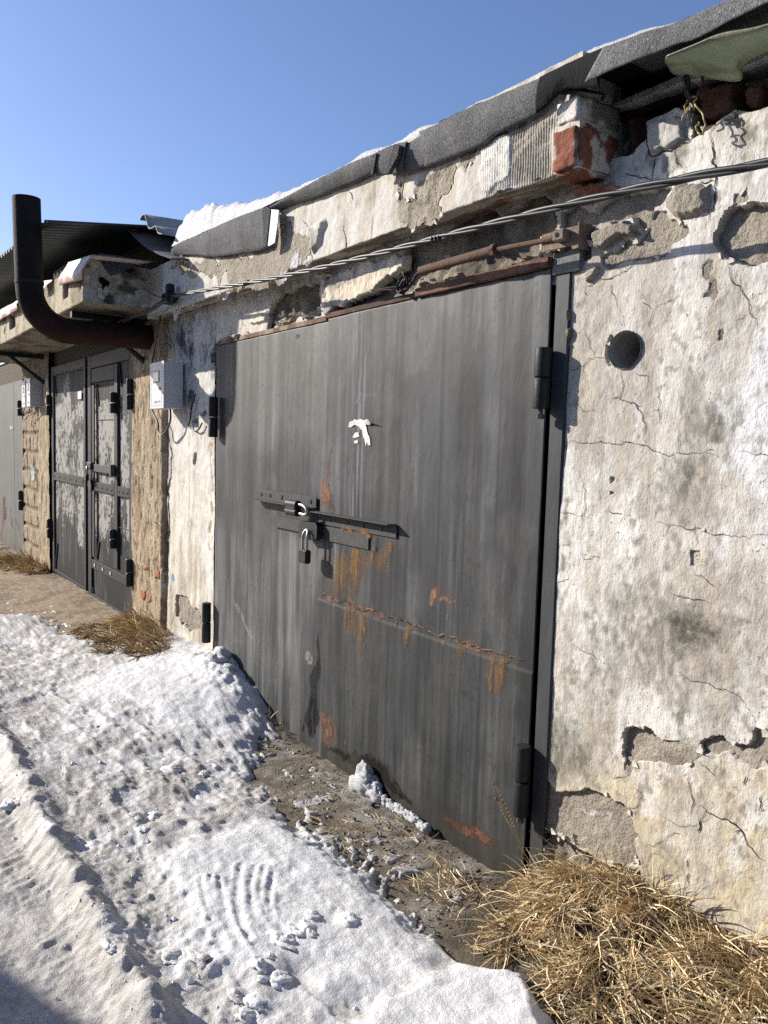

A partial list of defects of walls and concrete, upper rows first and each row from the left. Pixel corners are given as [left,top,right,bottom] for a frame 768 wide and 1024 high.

spalling [366,77,768,301]
peeling [170,217,321,324]
crack [567,325,768,466]
spalling [178,595,201,631]
rust [326,527,411,651]
spalling [619,725,768,783]
spalling [547,784,640,878]
crack [545,754,761,883]